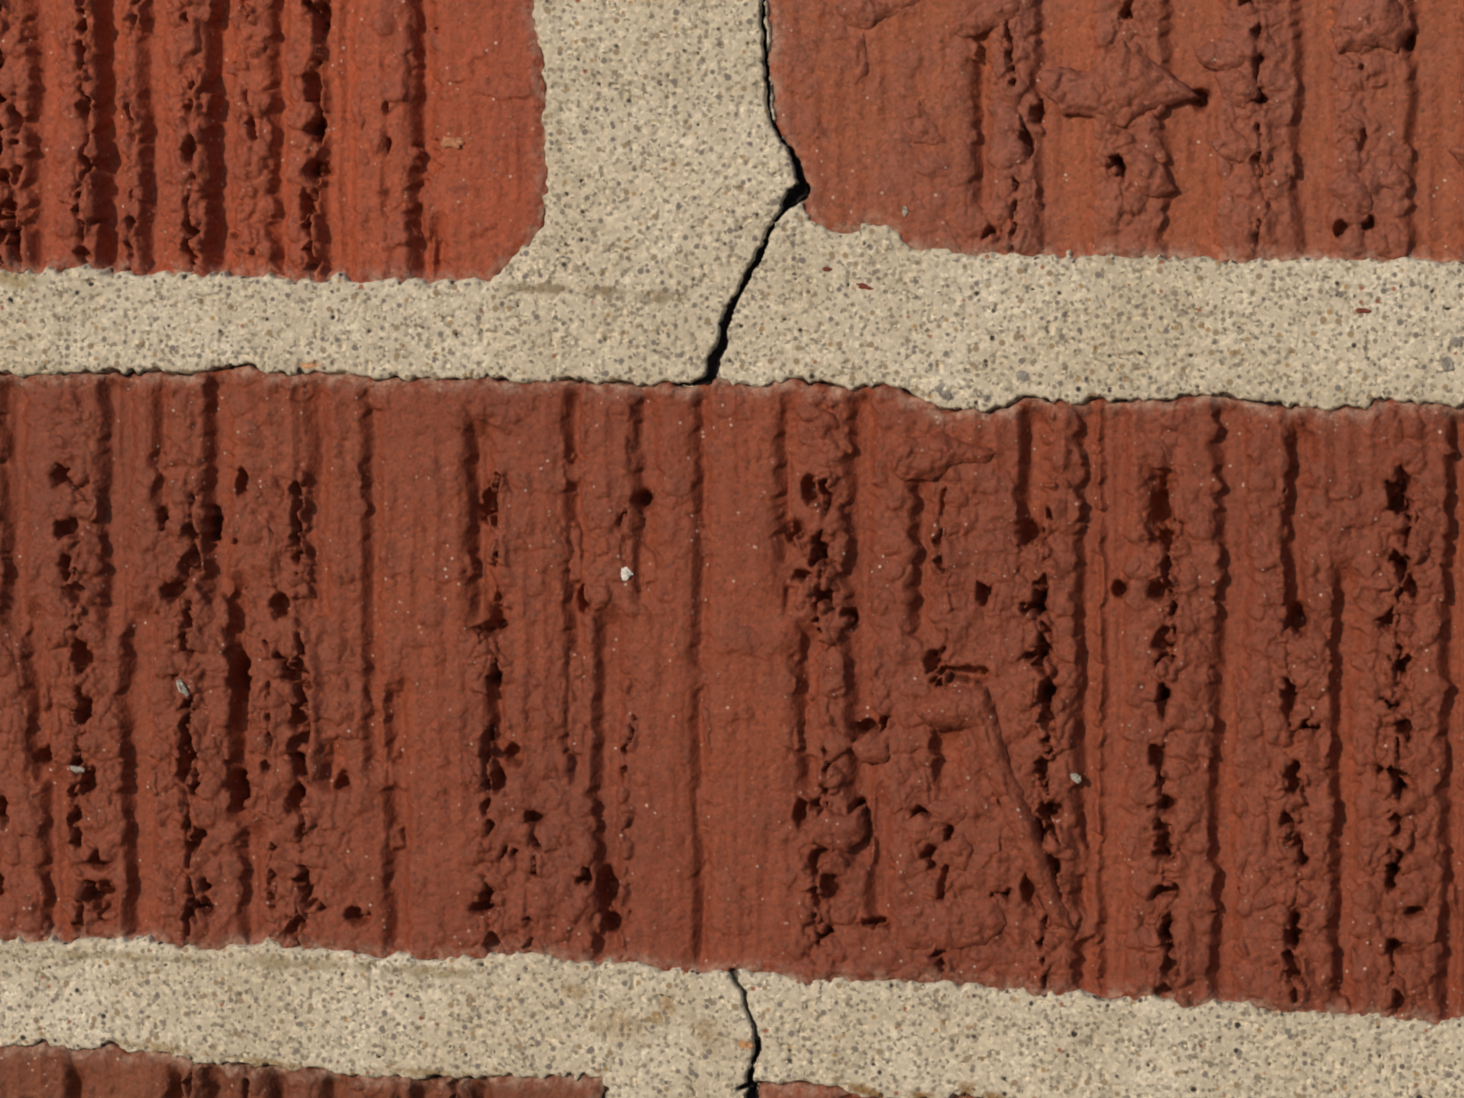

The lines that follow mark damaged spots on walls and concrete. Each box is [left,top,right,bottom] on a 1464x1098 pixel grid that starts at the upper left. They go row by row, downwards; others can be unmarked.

crack [675,0,839,389]
crack [1228,397,1283,408]
crack [731,970,762,1098]